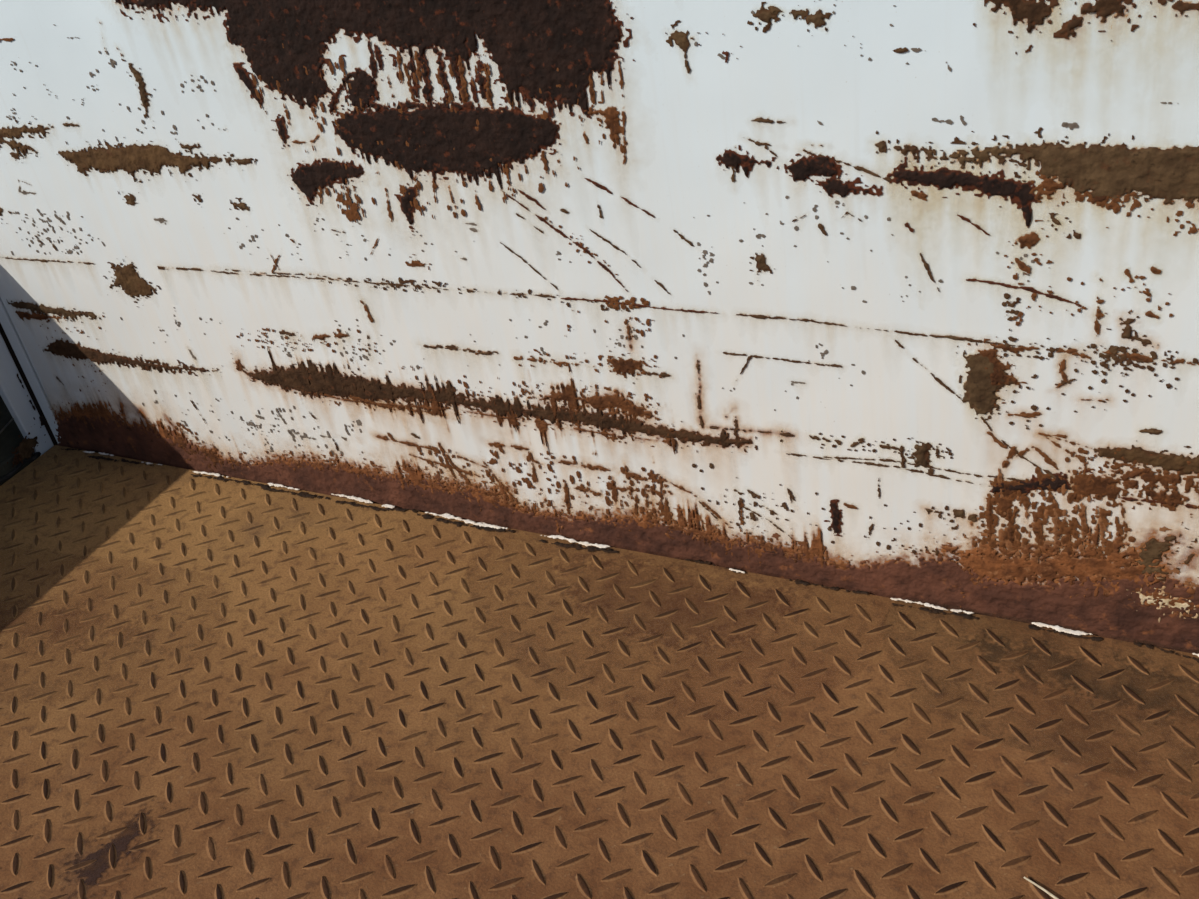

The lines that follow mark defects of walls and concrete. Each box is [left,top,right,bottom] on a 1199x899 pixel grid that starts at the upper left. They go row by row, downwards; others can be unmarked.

rust [0,22,257,183]
rust [115,0,635,238]
rust [984,0,1199,54]
rust [5,127,1199,654]